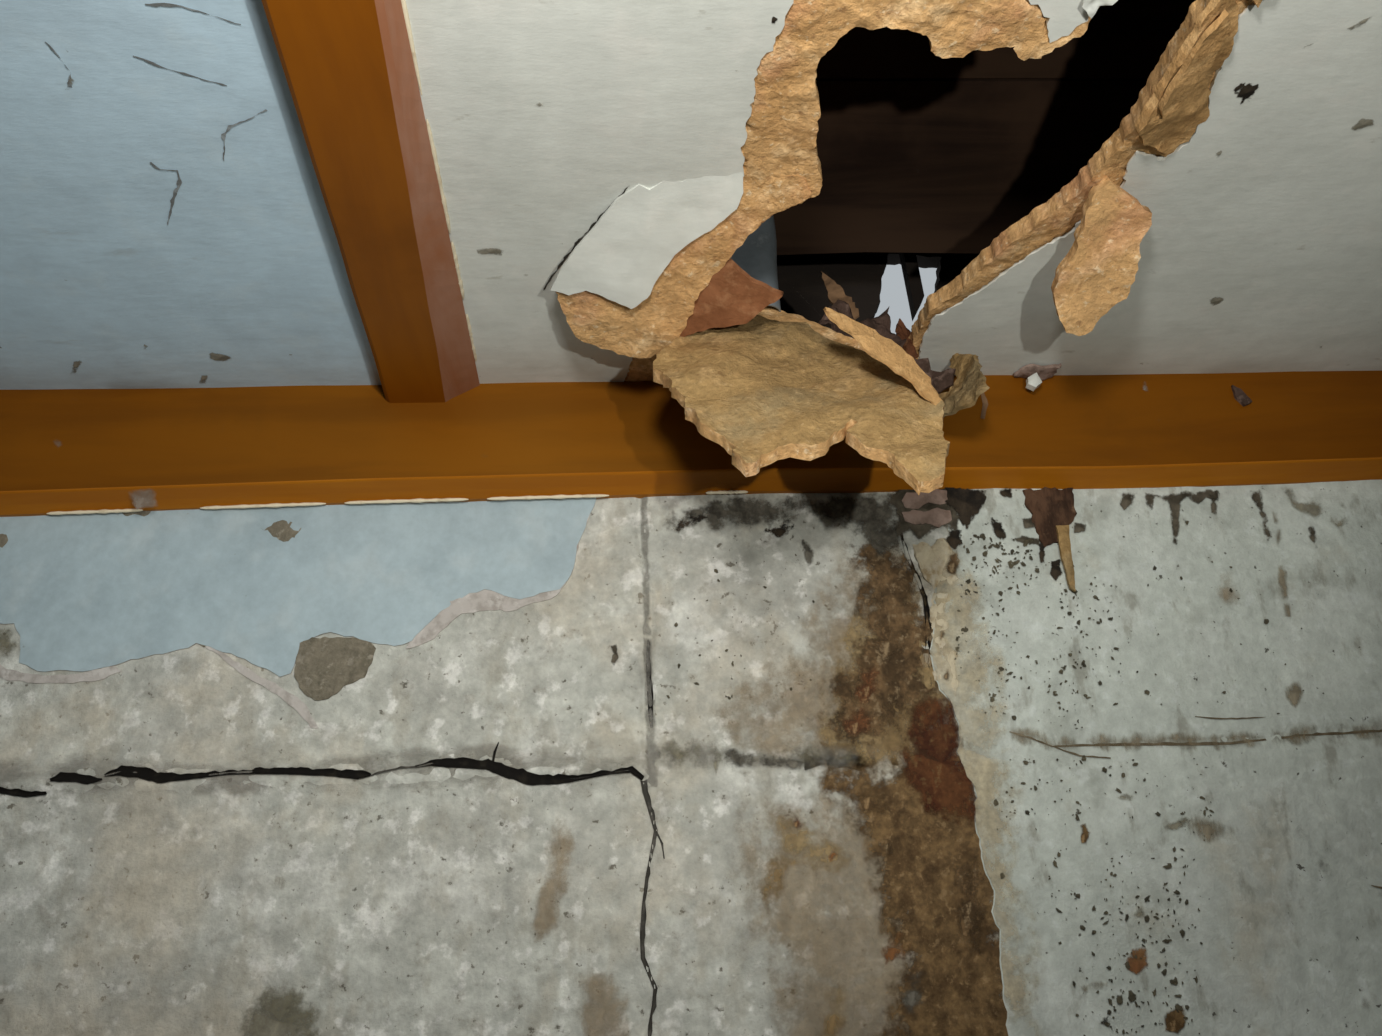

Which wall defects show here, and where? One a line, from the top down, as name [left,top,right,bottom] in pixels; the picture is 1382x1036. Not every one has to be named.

flaking render [1013,363,1062,381]
peeling [0,498,596,729]
water stain [1120,489,1219,544]
water stain [1251,492,1280,540]
water stain [1279,569,1290,616]
water stain [1286,490,1320,543]
crack [0,497,665,1036]
corrosion [667,540,1008,1036]
water stain [668,487,1158,1009]
peeling [902,480,1382,1036]